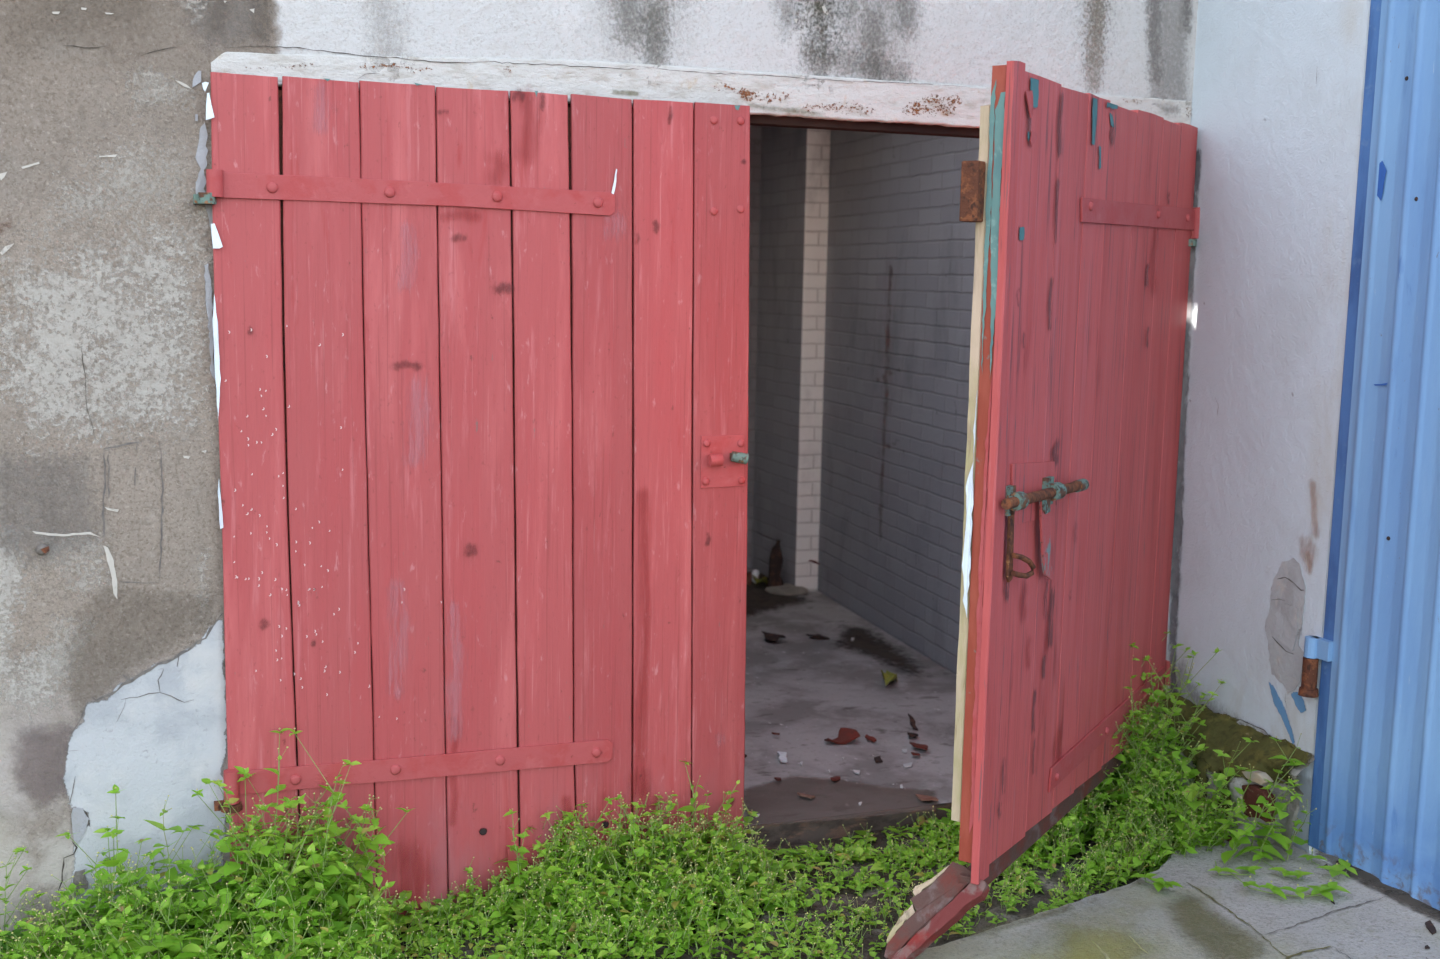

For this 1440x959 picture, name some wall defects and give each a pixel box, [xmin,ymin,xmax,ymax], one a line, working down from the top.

corrosion [714,83,792,102]
corrosion [903,94,962,117]
spalling [1265,558,1306,703]
spalling [73,869,88,896]
crack [1186,882,1383,959]